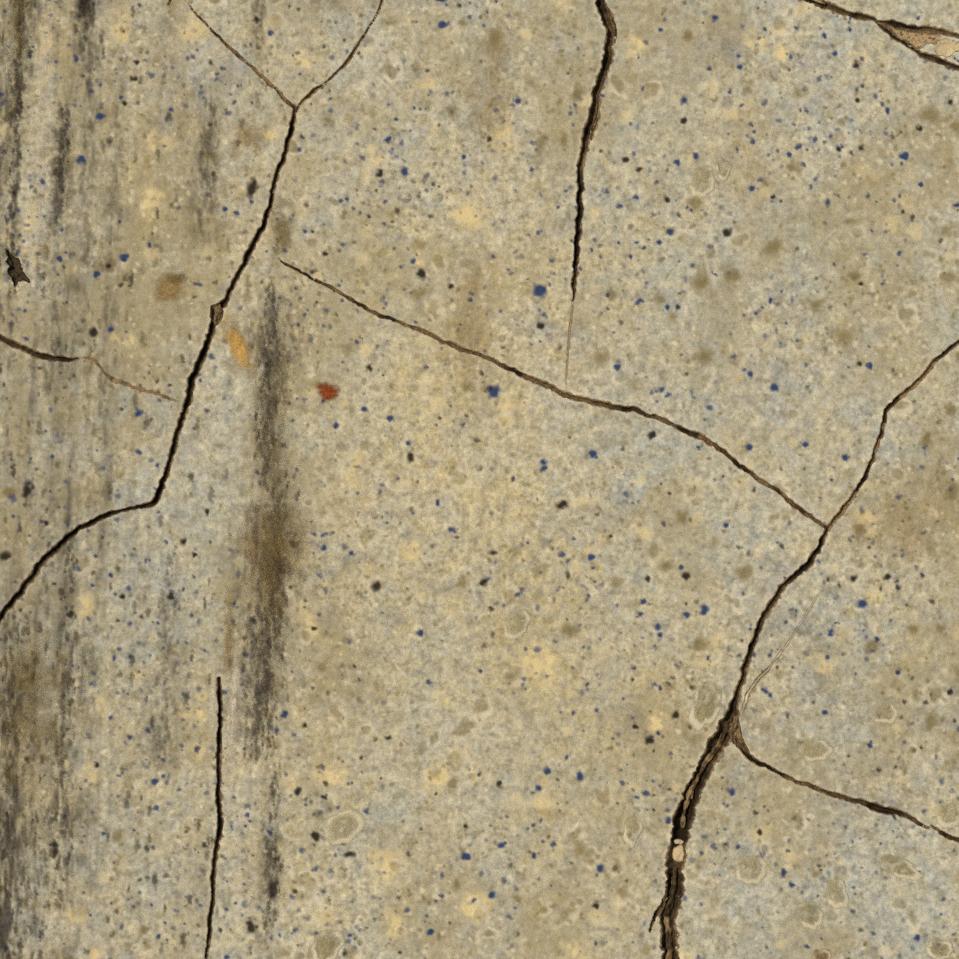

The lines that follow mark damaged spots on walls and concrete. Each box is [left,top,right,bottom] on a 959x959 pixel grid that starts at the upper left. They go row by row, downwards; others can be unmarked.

spalling [882,24,959,57]
crack [0,0,383,623]
crack [204,679,224,959]
damp [231,669,273,732]
damp [250,514,289,656]
crack [280,0,959,959]